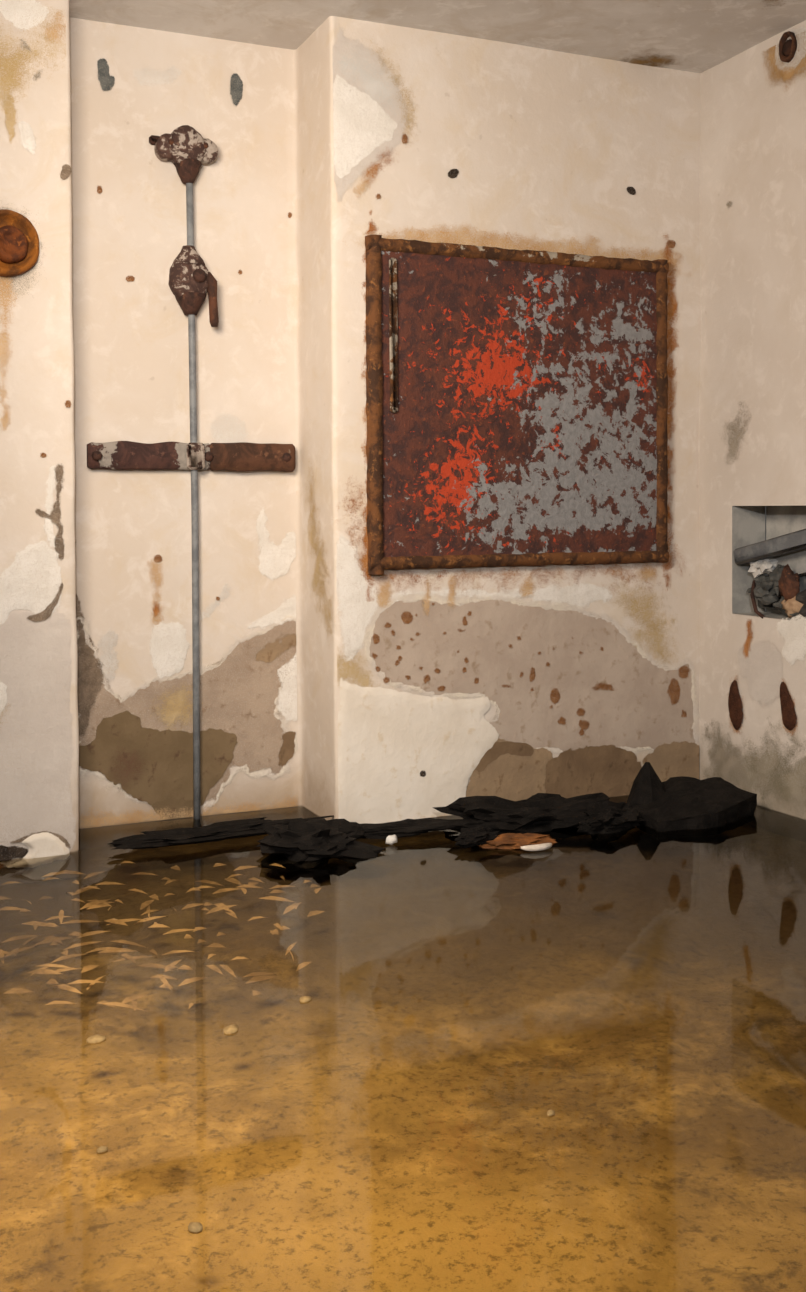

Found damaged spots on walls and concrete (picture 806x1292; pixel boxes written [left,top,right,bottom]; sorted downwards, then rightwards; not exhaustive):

peeling [0,0,50,31]
leakage [0,9,66,143]
peeling [332,27,421,201]
leakage [621,50,693,69]
corrosion [761,26,806,91]
corrosion [0,242,45,430]
corrosion [306,134,693,692]
peeling [0,540,63,624]
flaking render [76,595,297,814]
flaking render [336,535,699,754]
corrosion [503,647,590,735]
corrosion [667,665,690,718]